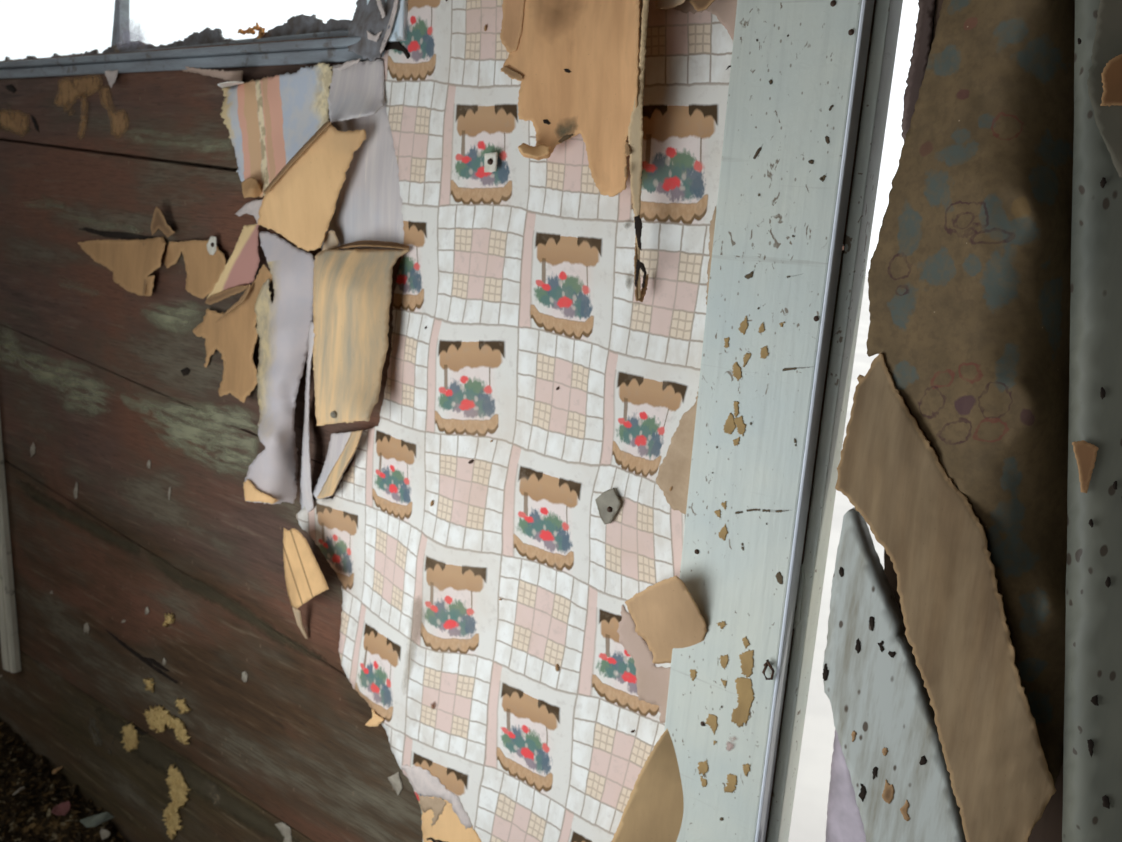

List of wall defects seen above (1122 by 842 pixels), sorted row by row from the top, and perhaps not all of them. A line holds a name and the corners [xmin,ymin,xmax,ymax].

peeling [500,0,715,302]
peeling [243,231,410,512]
peeling [724,307,765,348]
peeling [732,346,769,381]
peeling [723,401,752,446]
peeling [625,576,727,664]
peeling [869,616,896,658]
peeling [704,636,755,750]
peeling [418,795,481,842]
peeling [611,729,684,842]
peeling [724,763,751,793]
peeling [858,747,910,821]